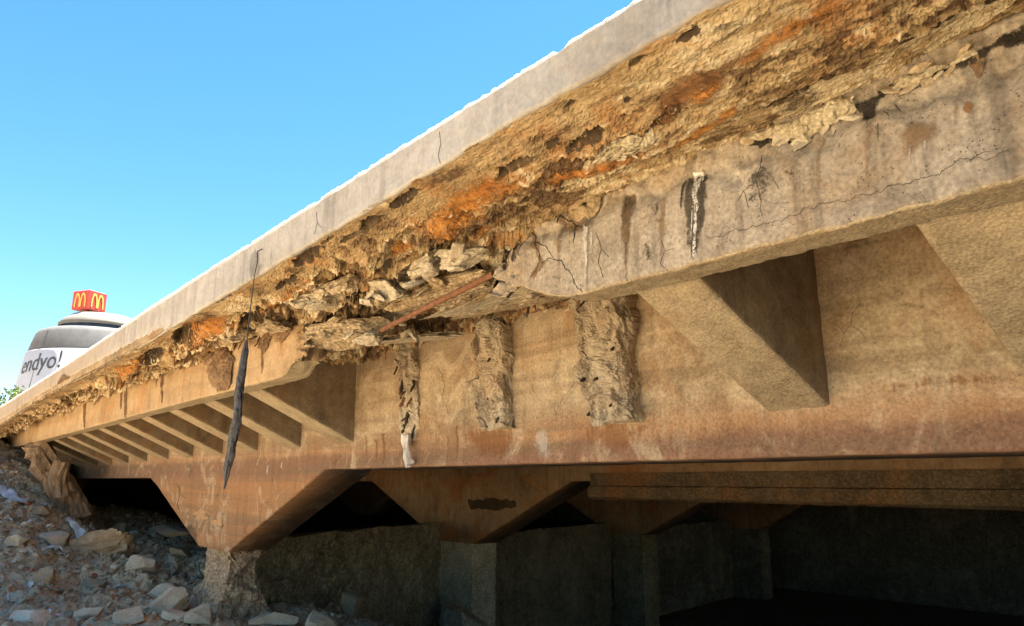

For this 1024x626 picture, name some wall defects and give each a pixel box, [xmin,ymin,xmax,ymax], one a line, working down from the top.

spalling [275,187,420,291]
corrosion [425,177,519,241]
crack [515,196,608,292]
corrosion [547,153,645,183]
spalling [546,103,683,164]
leakage [621,194,635,266]
leakage [680,172,707,259]
corrosion [673,106,738,148]
leakage [746,165,772,209]
peeling [740,95,862,151]
crack [706,150,1008,238]
spalling [137,240,586,439]